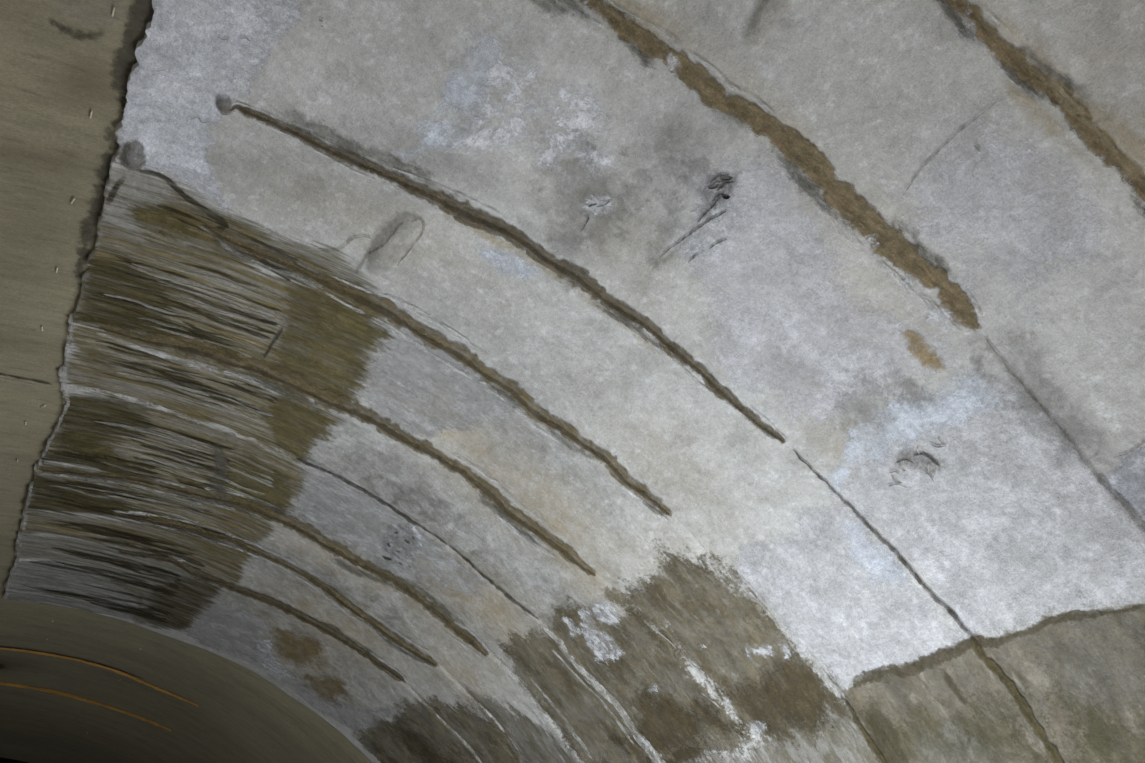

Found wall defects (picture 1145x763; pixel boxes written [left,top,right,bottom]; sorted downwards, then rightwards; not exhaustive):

leakage [6,327,280,623]
leakage [73,0,301,282]
leakage [96,257,280,424]
crack [271,218,424,272]
crack [297,458,538,619]
leakage [400,32,611,176]
leakage [185,160,1145,763]
crack [661,180,727,262]
rust [534,0,982,331]
crack [794,451,1064,763]
rust [935,0,1145,214]
crack [985,338,1145,529]